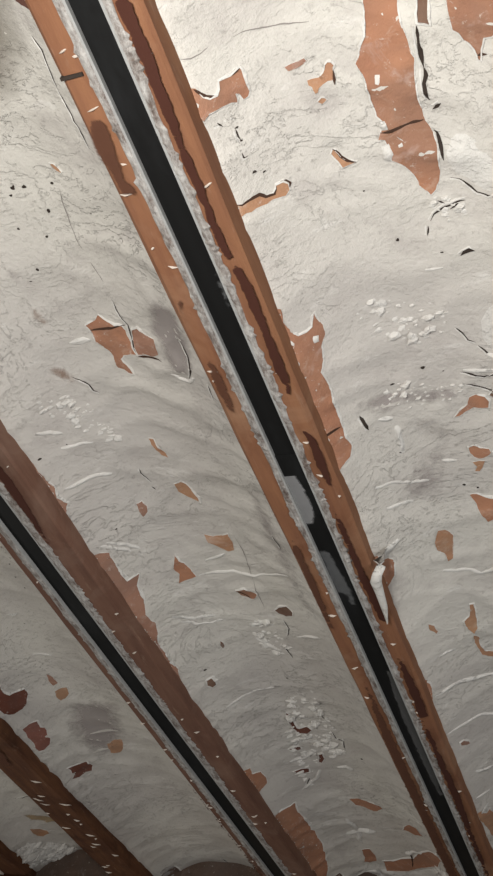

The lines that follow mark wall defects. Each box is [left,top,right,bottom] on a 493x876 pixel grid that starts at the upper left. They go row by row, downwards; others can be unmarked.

flaking render [191,64,251,121]
flaking render [355,0,467,222]
crack [411,26,493,235]
flaking render [237,179,291,217]
flaking render [84,314,160,375]
flaking render [462,603,493,656]
flaking render [0,685,28,715]
flaking render [276,801,344,876]
flaking render [357,848,447,876]
flaking render [402,825,423,837]